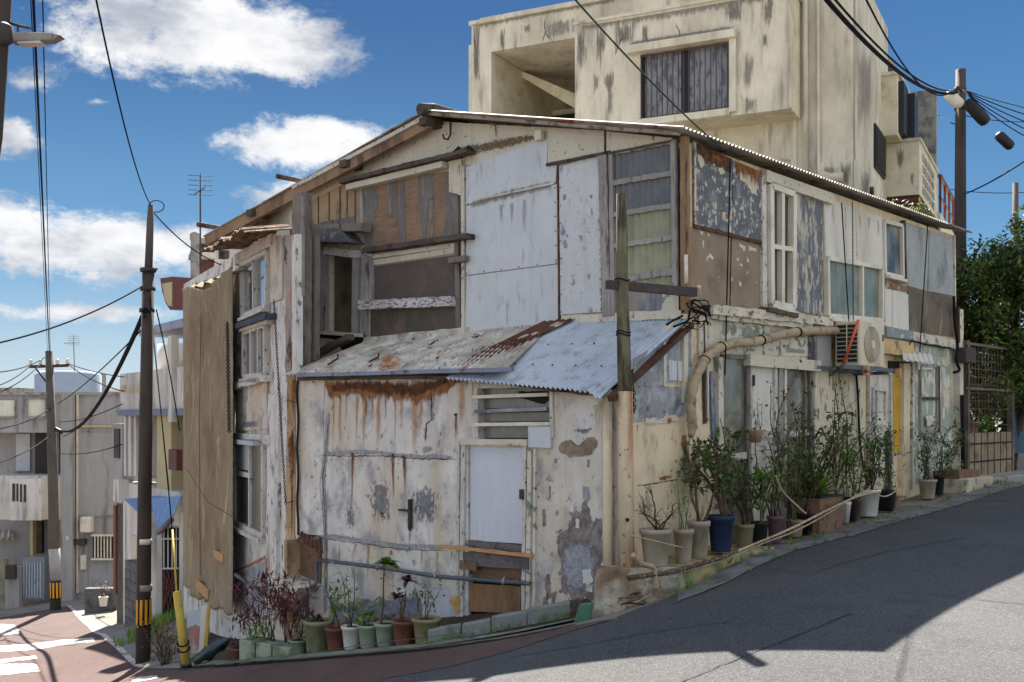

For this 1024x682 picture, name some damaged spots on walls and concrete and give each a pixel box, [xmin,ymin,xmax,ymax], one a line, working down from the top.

leakage [474,0,772,77]
leakage [594,75,612,110]
peeling [740,171,758,196]
corrosion [452,318,573,366]
corrosion [324,379,473,431]
spalling [554,428,597,467]
peeling [543,486,603,611]